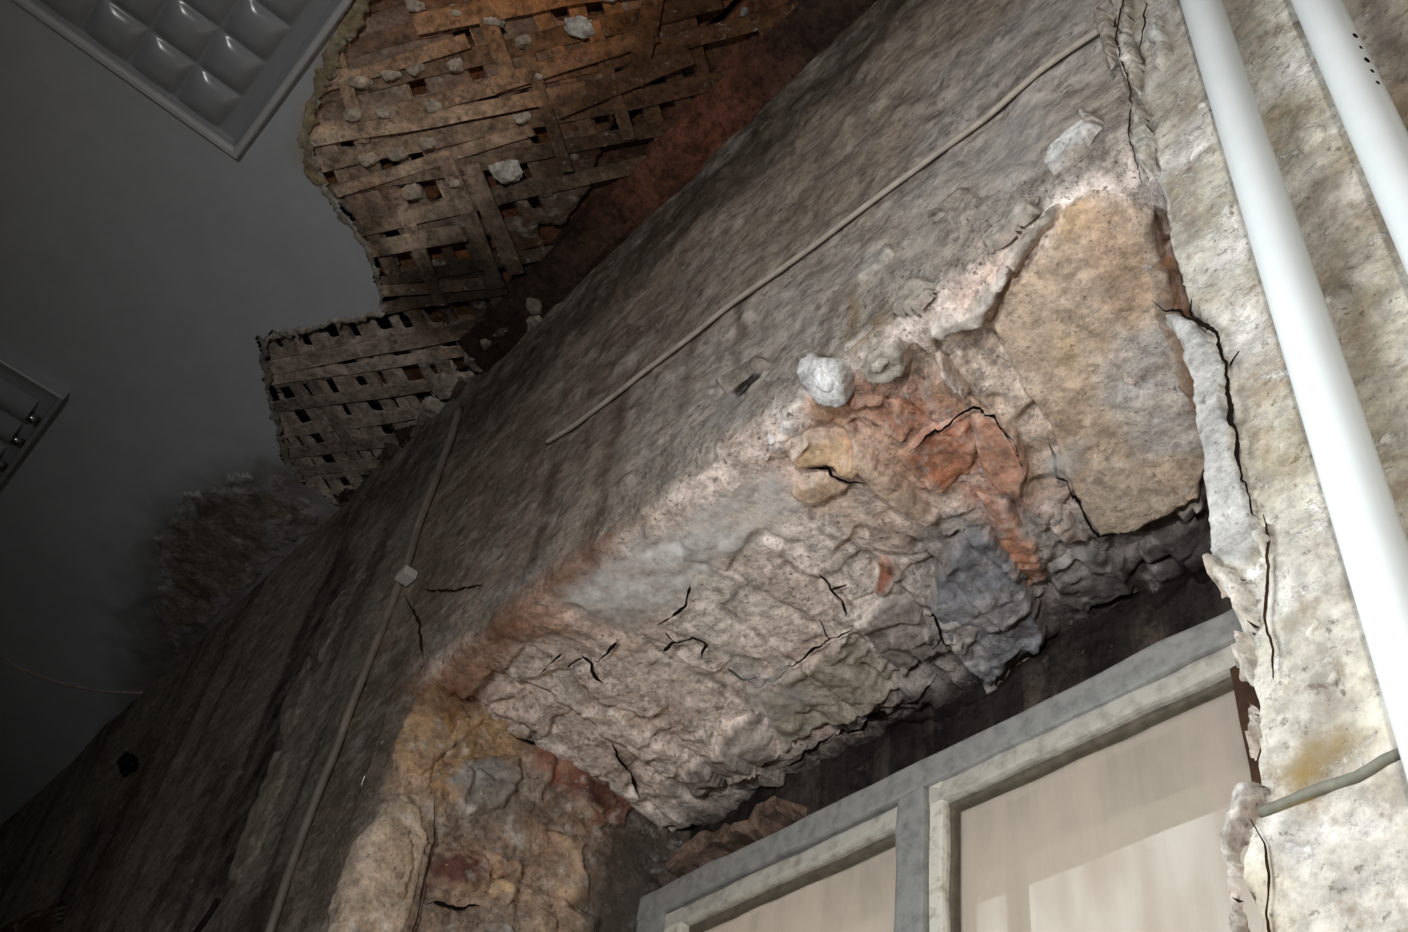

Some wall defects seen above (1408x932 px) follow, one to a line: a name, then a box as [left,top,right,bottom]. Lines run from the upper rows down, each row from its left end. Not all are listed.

spalling [550,0,642,52]
crack [1114,0,1147,184]
spalling [258,0,626,508]
spalling [681,187,1212,797]
crack [1152,299,1274,679]
flaking render [327,683,632,932]
crack [540,641,618,683]
crack [610,740,640,799]
crack [658,573,853,688]
crack [778,613,984,769]
peeling [1219,781,1271,932]
peeling [1231,630,1263,761]